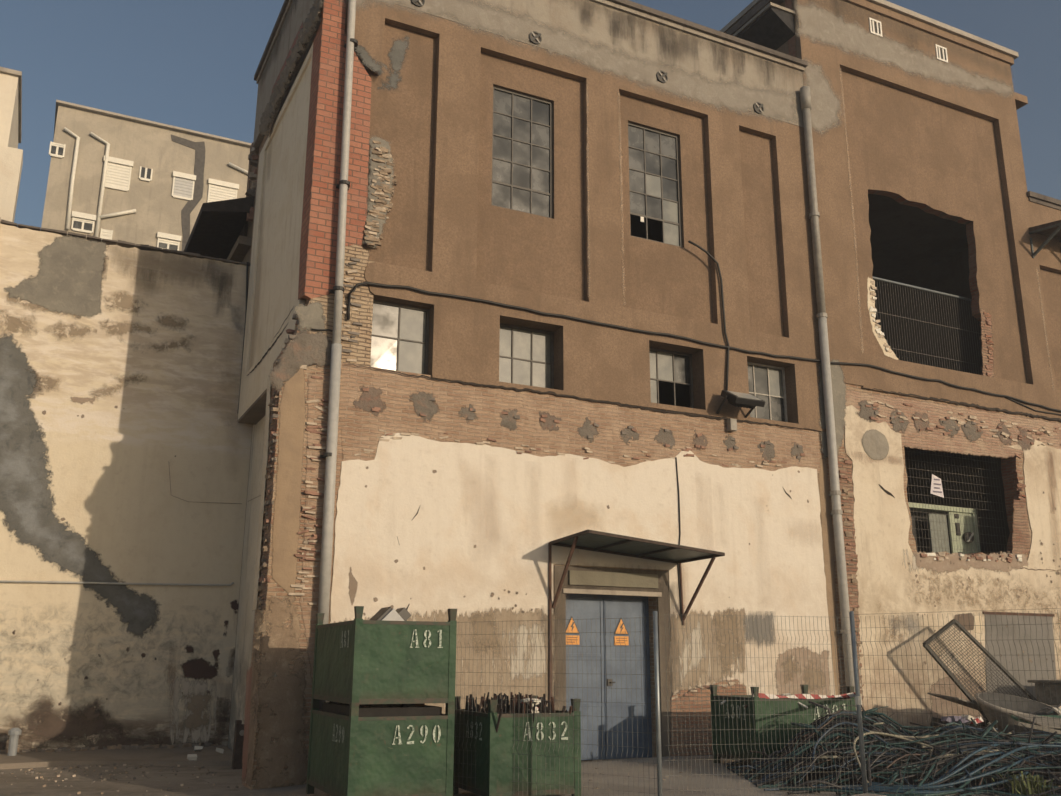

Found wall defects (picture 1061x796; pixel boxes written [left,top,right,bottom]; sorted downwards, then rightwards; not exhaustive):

spalling [856,264,899,360]
spalling [979,307,994,377]
spalling [257,136,820,681]
spalling [845,390,1061,590]
damp [0,700,221,752]
spalling [181,646,220,694]
peeling [407,589,559,710]
peeling [667,608,747,756]
peeling [775,647,830,696]
spalling [954,613,983,644]